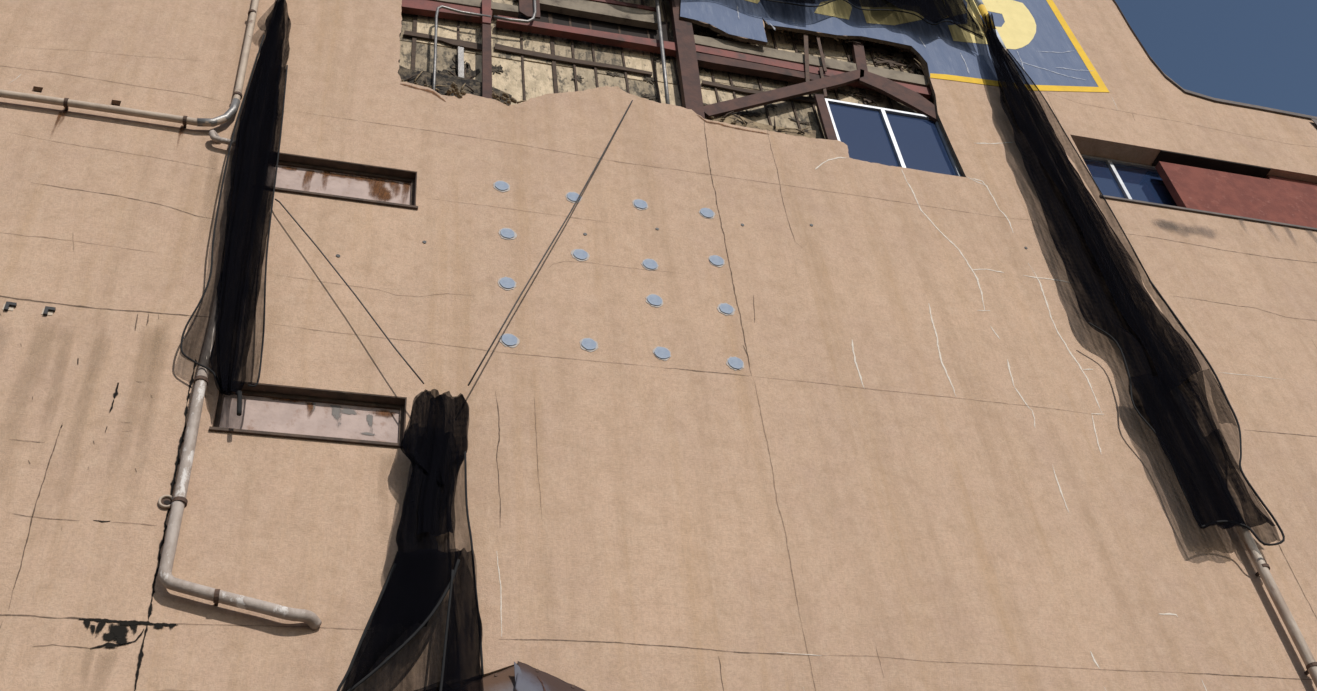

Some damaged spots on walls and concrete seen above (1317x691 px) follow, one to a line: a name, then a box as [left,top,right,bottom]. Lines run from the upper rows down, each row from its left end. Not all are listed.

spalling [423,54,503,79]
spalling [640,54,670,101]
spalling [698,103,777,134]
rust [282,167,410,200]
crack [0,296,191,329]
crack [901,169,1102,455]
crack [0,364,197,691]
crack [1180,672,1312,691]